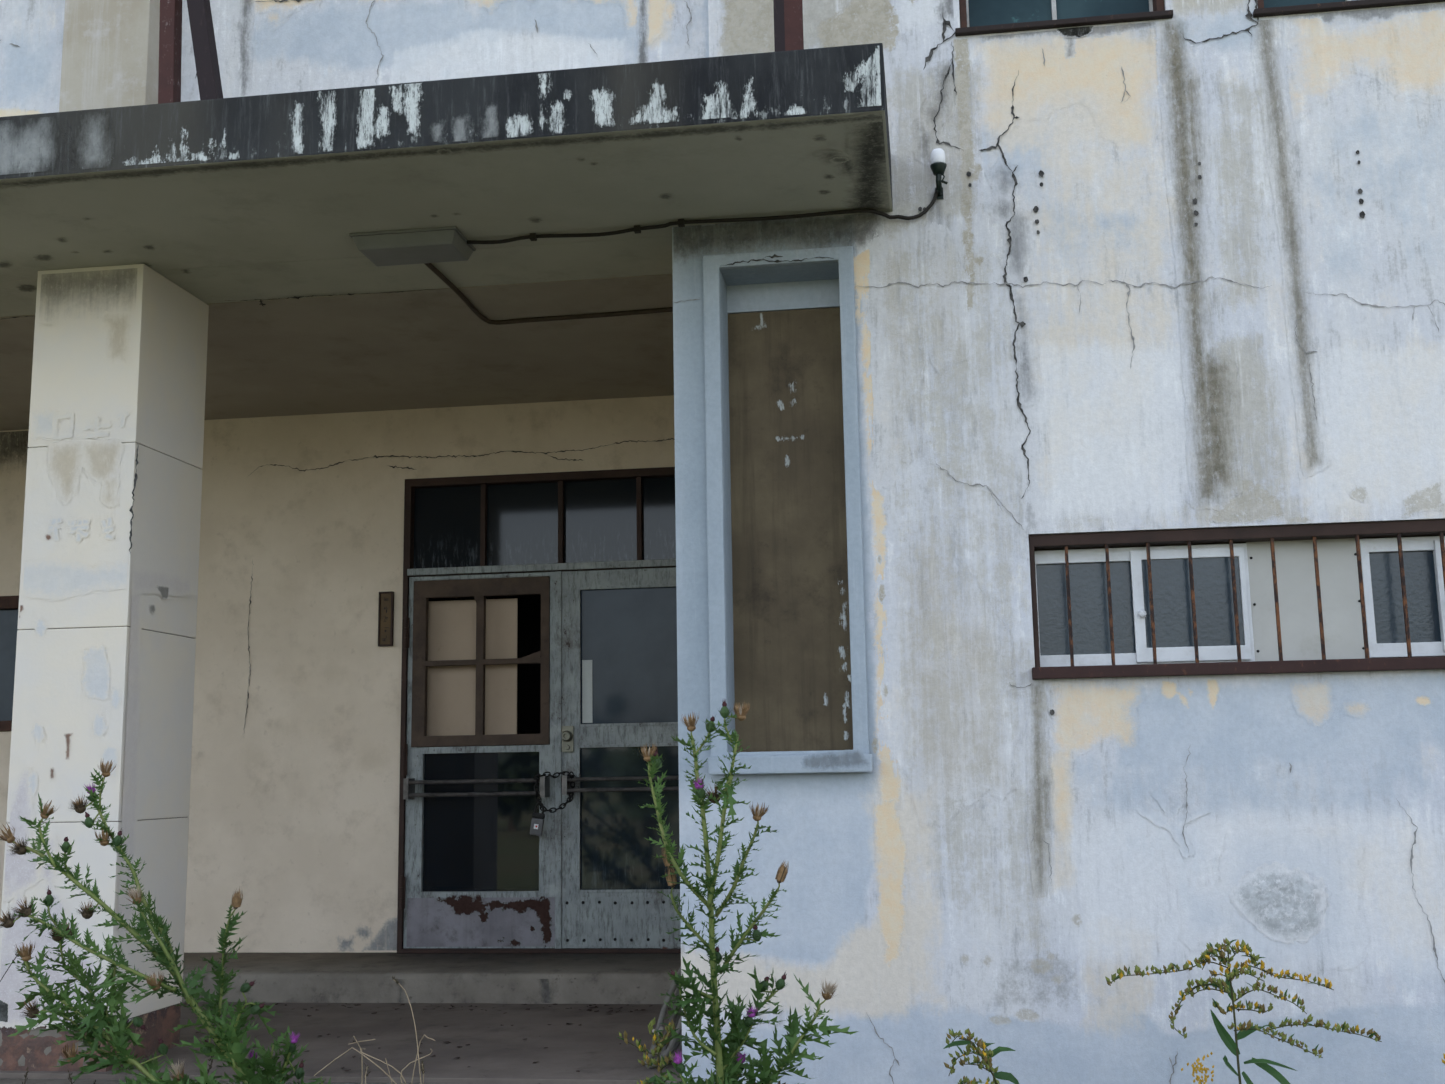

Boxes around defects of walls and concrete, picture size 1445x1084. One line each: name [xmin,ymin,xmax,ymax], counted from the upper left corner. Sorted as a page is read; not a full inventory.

peeling [254,0,324,31]
peeling [562,0,678,46]
crack [1180,0,1259,44]
peeling [0,106,45,117]
crack [855,14,1269,531]
water stain [979,13,1244,511]
water stain [1250,3,1445,478]
crack [1294,292,1445,423]
crack [251,438,675,474]
peeling [1288,677,1372,727]
crack [1397,800,1445,983]
corrosion [437,893,553,948]